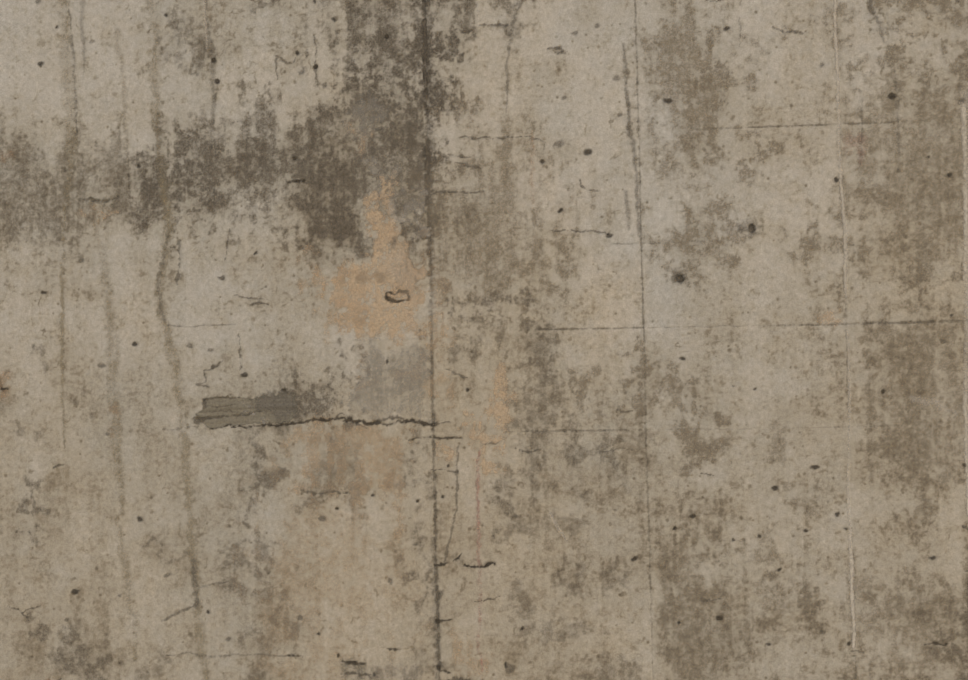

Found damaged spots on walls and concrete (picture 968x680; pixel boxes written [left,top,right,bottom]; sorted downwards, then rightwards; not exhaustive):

water stain [142,0,475,257]
spalling [193,388,297,428]
crack [210,413,454,440]